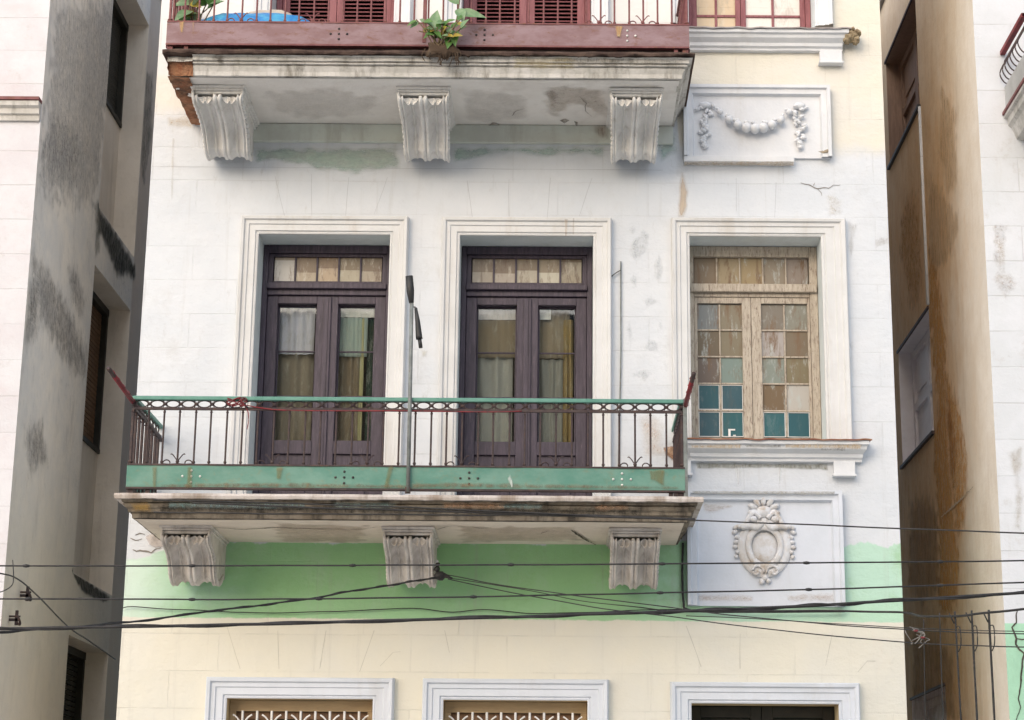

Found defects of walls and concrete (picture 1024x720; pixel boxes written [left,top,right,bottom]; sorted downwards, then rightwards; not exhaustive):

spalling [167,57,200,125]
leakage [142,76,152,183]
peeling [258,149,395,170]
leakage [96,208,135,278]